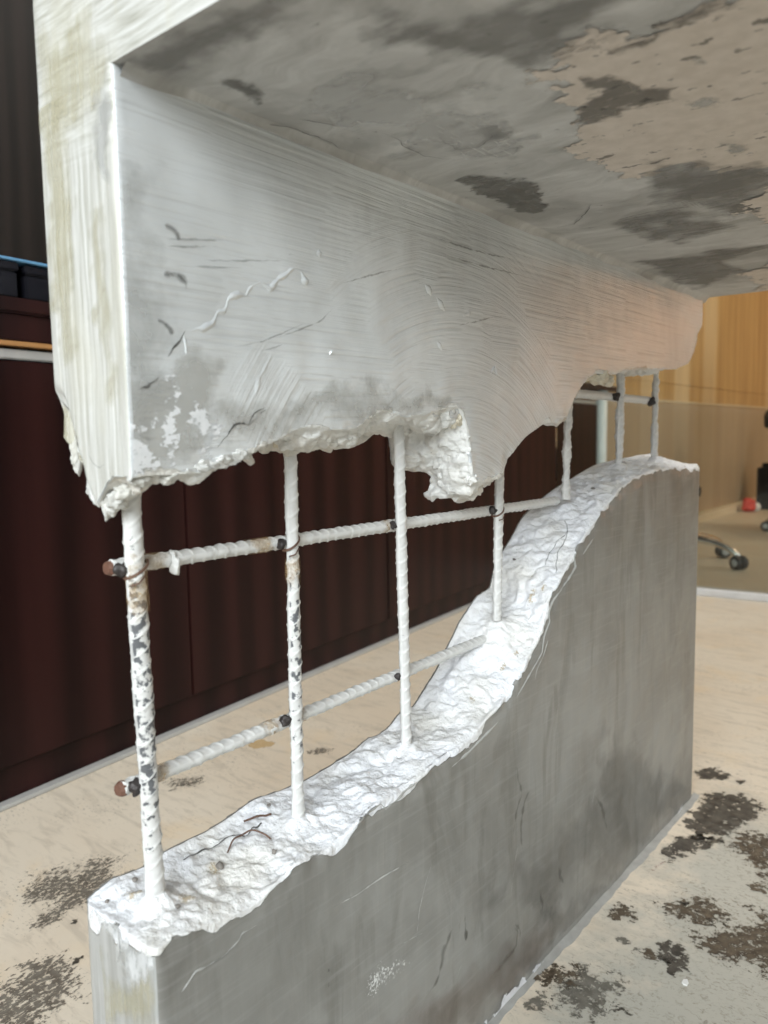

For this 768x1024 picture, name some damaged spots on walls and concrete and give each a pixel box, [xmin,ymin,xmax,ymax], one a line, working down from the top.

water stain [457,176,548,213]
water stain [654,165,768,214]
water stain [623,213,723,241]
water stain [640,246,764,285]
peeling [69,367,258,521]
peeling [95,911,153,982]